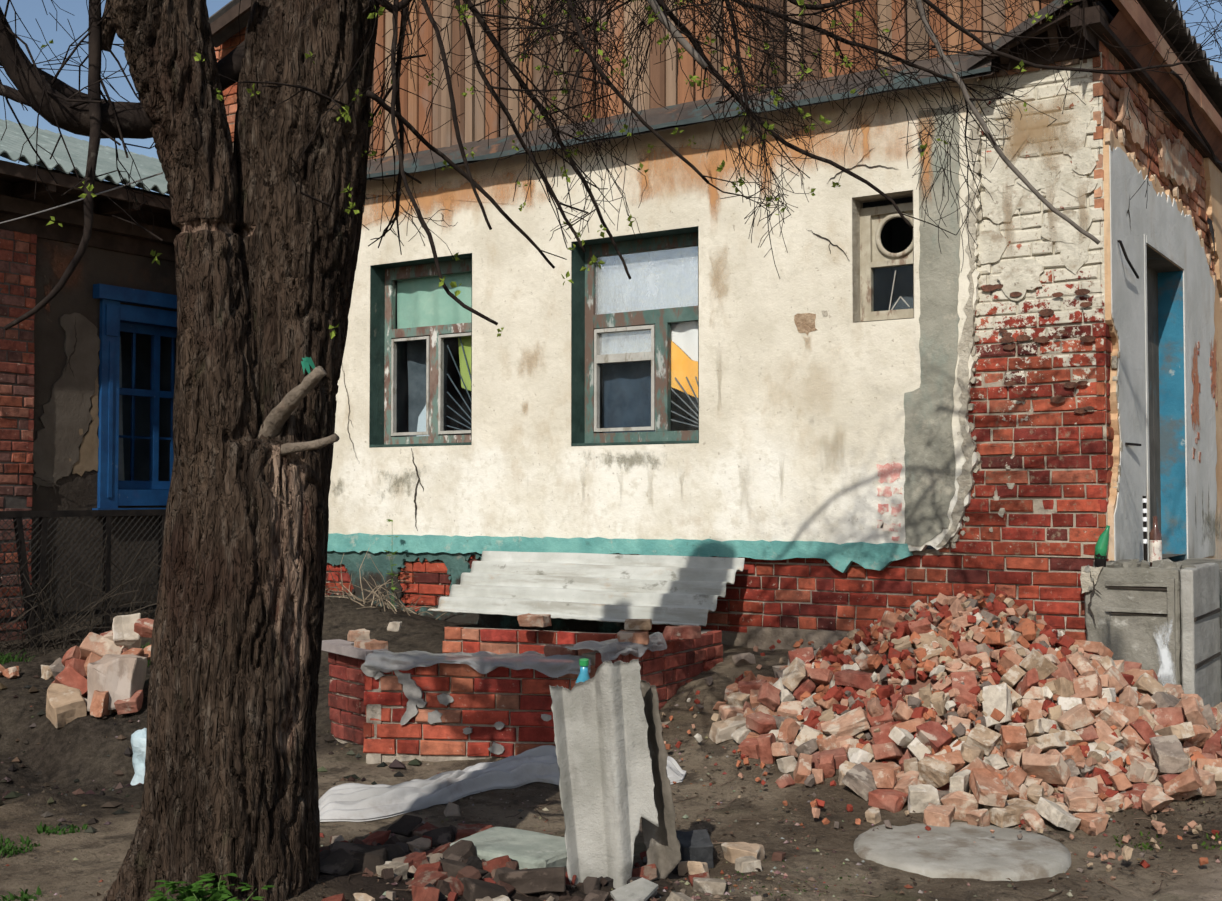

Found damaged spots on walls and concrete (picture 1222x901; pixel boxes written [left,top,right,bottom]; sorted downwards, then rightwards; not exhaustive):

rust [640,121,869,210]
rust [921,128,931,182]
rust [365,171,533,222]
spalling [794,310,828,336]
spalling [936,41,1222,594]
peeling [32,313,100,491]
crack [411,448,424,531]
spalling [398,556,452,611]
spalling [466,552,482,573]